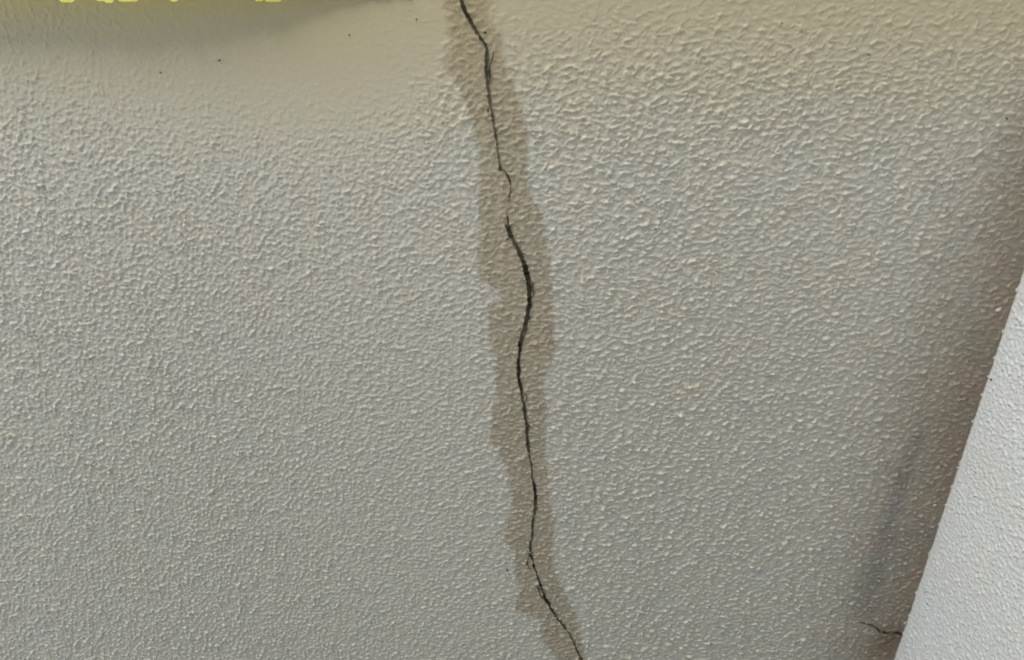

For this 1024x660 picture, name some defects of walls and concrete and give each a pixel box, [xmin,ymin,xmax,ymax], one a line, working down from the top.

crack [459,0,583,660]